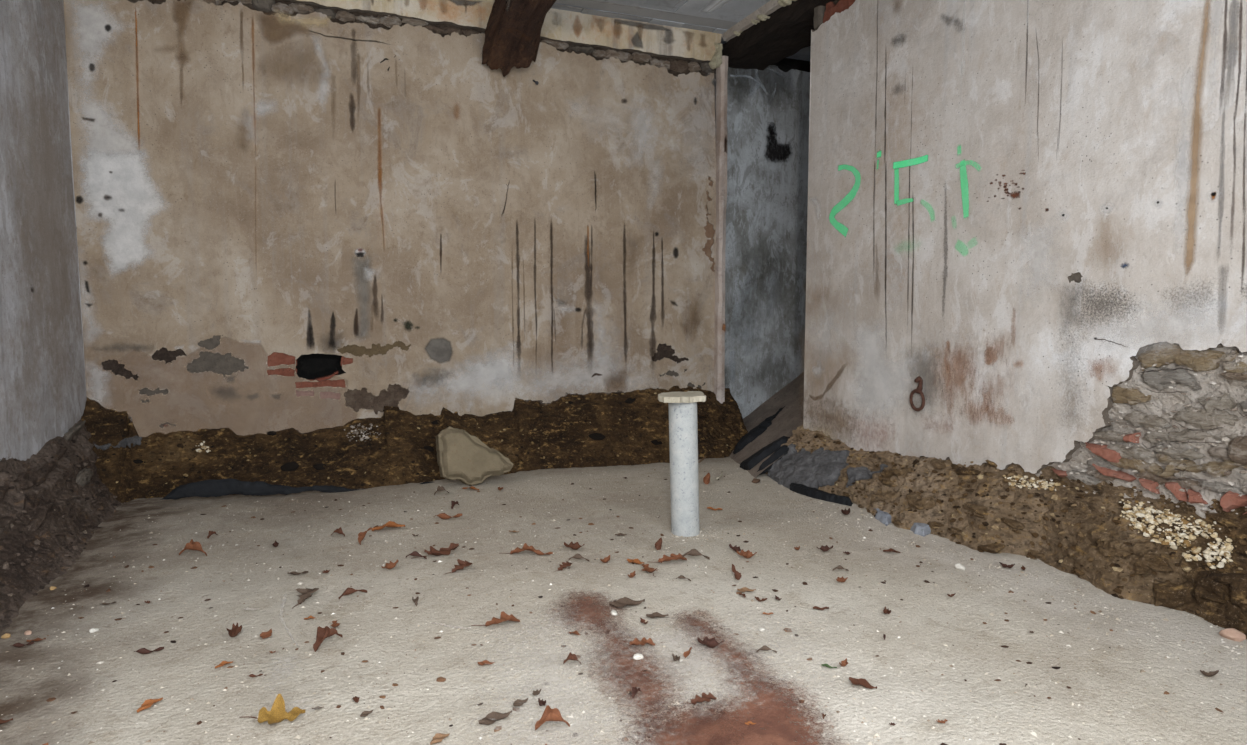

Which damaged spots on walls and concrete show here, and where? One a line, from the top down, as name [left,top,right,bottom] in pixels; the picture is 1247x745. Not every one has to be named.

water stain [1222,0,1247,105]
water stain [1185,1,1209,270]
spalling [102,359,169,403]
spalling [152,335,249,378]
spalling [267,341,411,414]
water stain [534,223,553,365]
water stain [585,226,594,356]
water stain [650,233,664,360]
spalling [1035,342,1247,518]